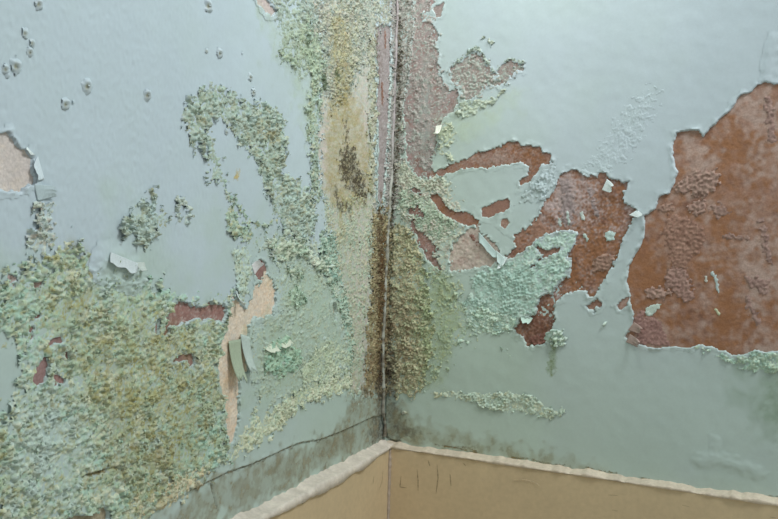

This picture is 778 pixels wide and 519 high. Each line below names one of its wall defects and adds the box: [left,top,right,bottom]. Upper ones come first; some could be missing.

peeling [0,122,57,201]
water stain [336,120,369,205]
water stain [371,18,402,442]
peeling [315,0,778,408]
peeling [0,265,73,394]
peeling [148,255,280,453]
peeling [64,501,111,519]